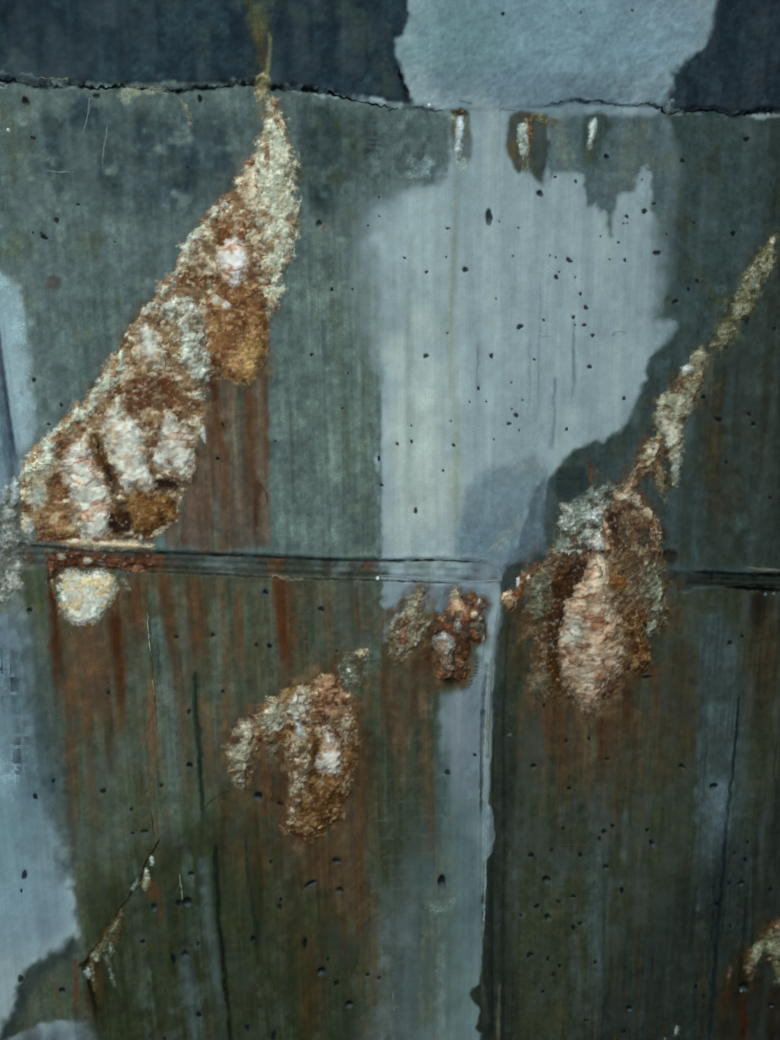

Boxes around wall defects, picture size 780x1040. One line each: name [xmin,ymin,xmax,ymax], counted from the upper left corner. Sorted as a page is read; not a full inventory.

crack [0,69,443,112]
crack [556,98,774,116]
rust [166,354,270,550]
leakage [0,0,490,1040]
leakage [457,0,780,1040]
rust [48,586,62,677]
rust [79,570,173,720]
crack [79,820,159,1006]